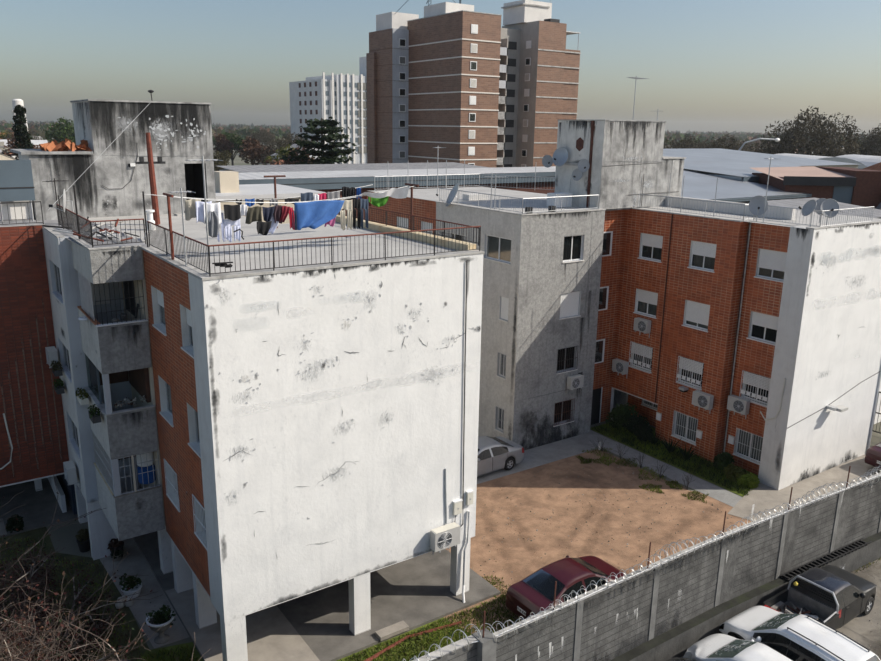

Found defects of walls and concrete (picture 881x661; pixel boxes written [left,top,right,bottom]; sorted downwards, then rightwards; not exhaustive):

damp [77,101,208,150]
damp [40,154,92,204]
damp [522,418,578,450]